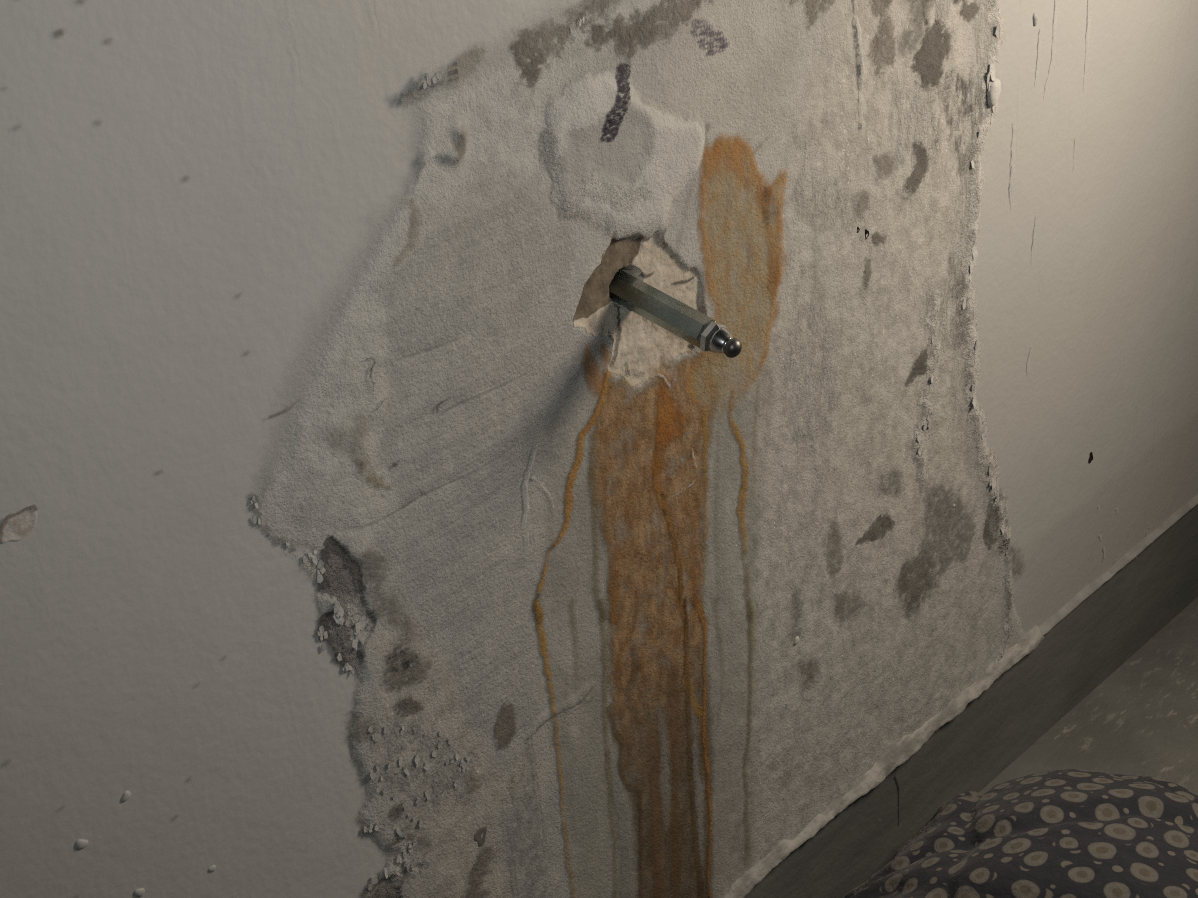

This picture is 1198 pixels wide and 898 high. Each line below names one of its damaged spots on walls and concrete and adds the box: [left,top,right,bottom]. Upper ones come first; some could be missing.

damp [512,0,712,87]
damp [870,0,951,88]
damp [954,0,979,22]
damp [905,142,929,198]
peeling [249,0,1027,898]
peeling [0,505,37,544]
corrosion [552,138,786,898]
damp [384,646,431,716]
corrosion [534,563,573,875]
damp [466,848,493,898]